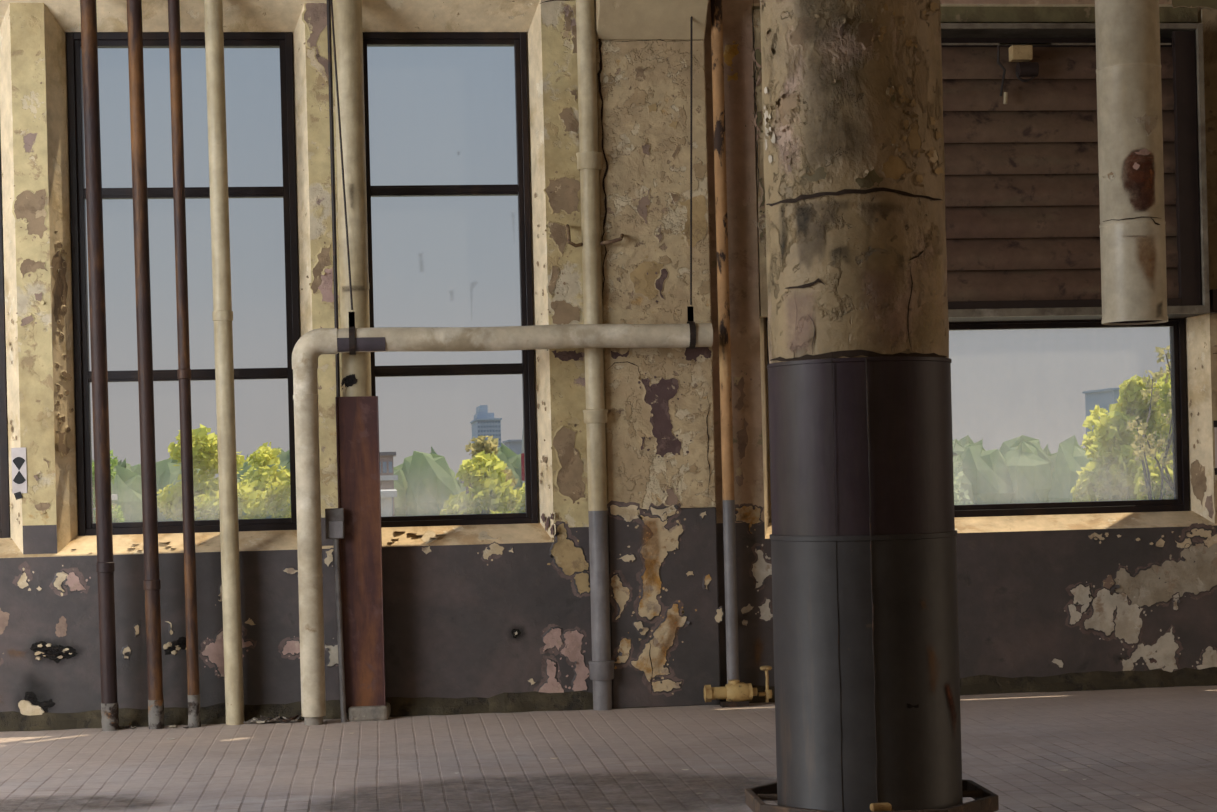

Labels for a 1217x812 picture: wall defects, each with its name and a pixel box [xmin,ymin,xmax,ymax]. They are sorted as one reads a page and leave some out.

peeling [745,27,829,184]
crack [752,0,942,206]
rust [1122,148,1155,211]
peeling [682,347,713,365]
peeling [638,373,692,462]
peeling [12,561,91,597]
peeling [607,484,707,697]
peeling [735,503,773,627]
peeling [1063,398,1217,672]
spalling [30,616,78,663]
peeling [527,624,590,693]
spalling [18,692,55,716]